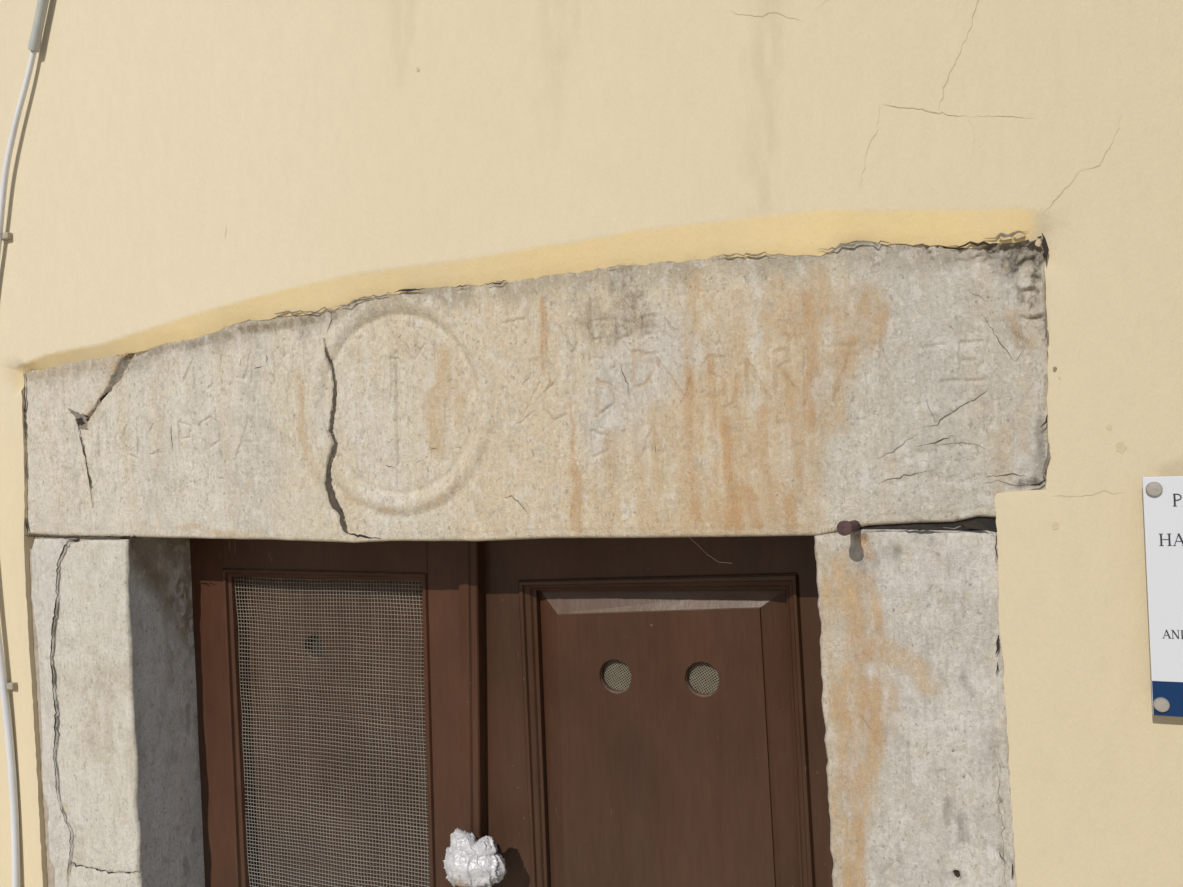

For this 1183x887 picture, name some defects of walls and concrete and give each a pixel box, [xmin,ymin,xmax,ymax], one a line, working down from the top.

crack [860,0,1036,185]
crack [78,428,93,504]
crack [274,289,421,539]
crack [50,539,144,875]